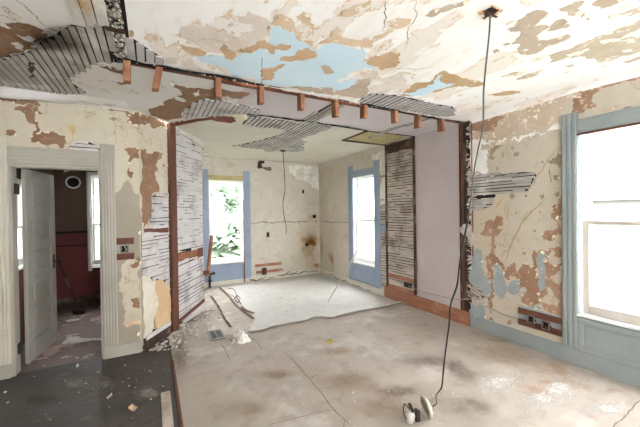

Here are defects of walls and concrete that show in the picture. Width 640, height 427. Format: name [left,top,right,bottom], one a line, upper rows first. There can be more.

peeling [0,22,47,58]
peeling [99,66,126,85]
peeling [163,12,483,99]
crack [384,2,418,48]
peeling [426,0,470,17]
peeling [501,72,540,80]
peeling [493,0,640,67]
peeling [0,98,66,148]
peeling [93,83,249,129]
peeling [115,148,171,350]
peeling [468,188,562,322]
crack [266,350,350,427]